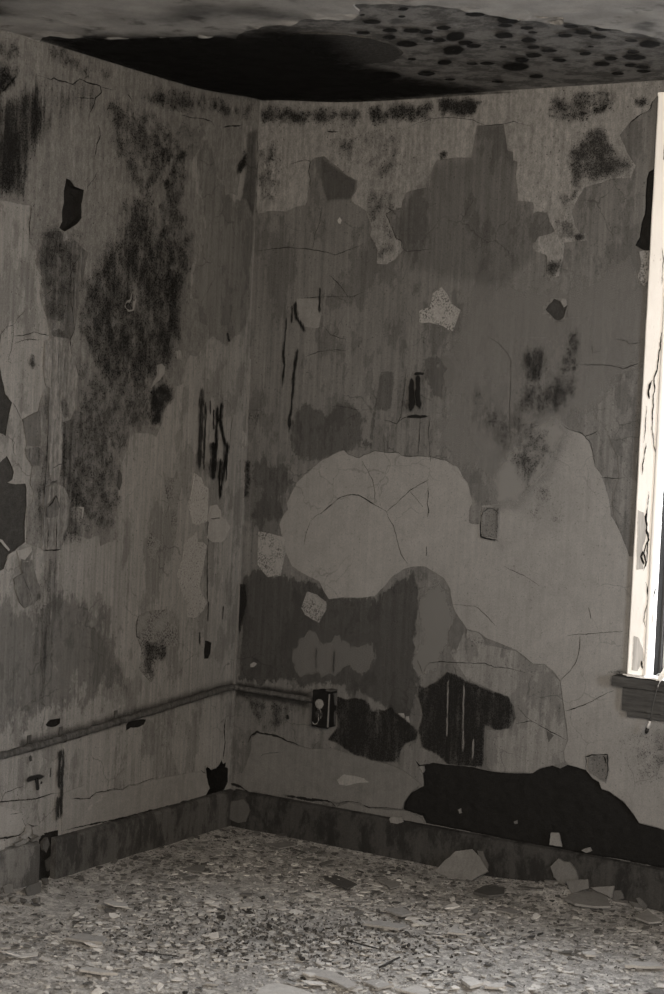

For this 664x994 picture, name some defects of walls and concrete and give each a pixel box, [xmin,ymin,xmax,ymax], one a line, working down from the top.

damp [0,38,96,202]
damp [467,17,566,78]
damp [548,91,633,241]
damp [558,22,660,75]
damp [32,7,504,542]
peeling [0,0,664,618]
crack [304,374,450,560]
damp [474,334,579,488]
flaking render [243,369,664,868]
crack [0,777,157,841]
crack [69,797,200,830]
peeling [0,719,664,994]